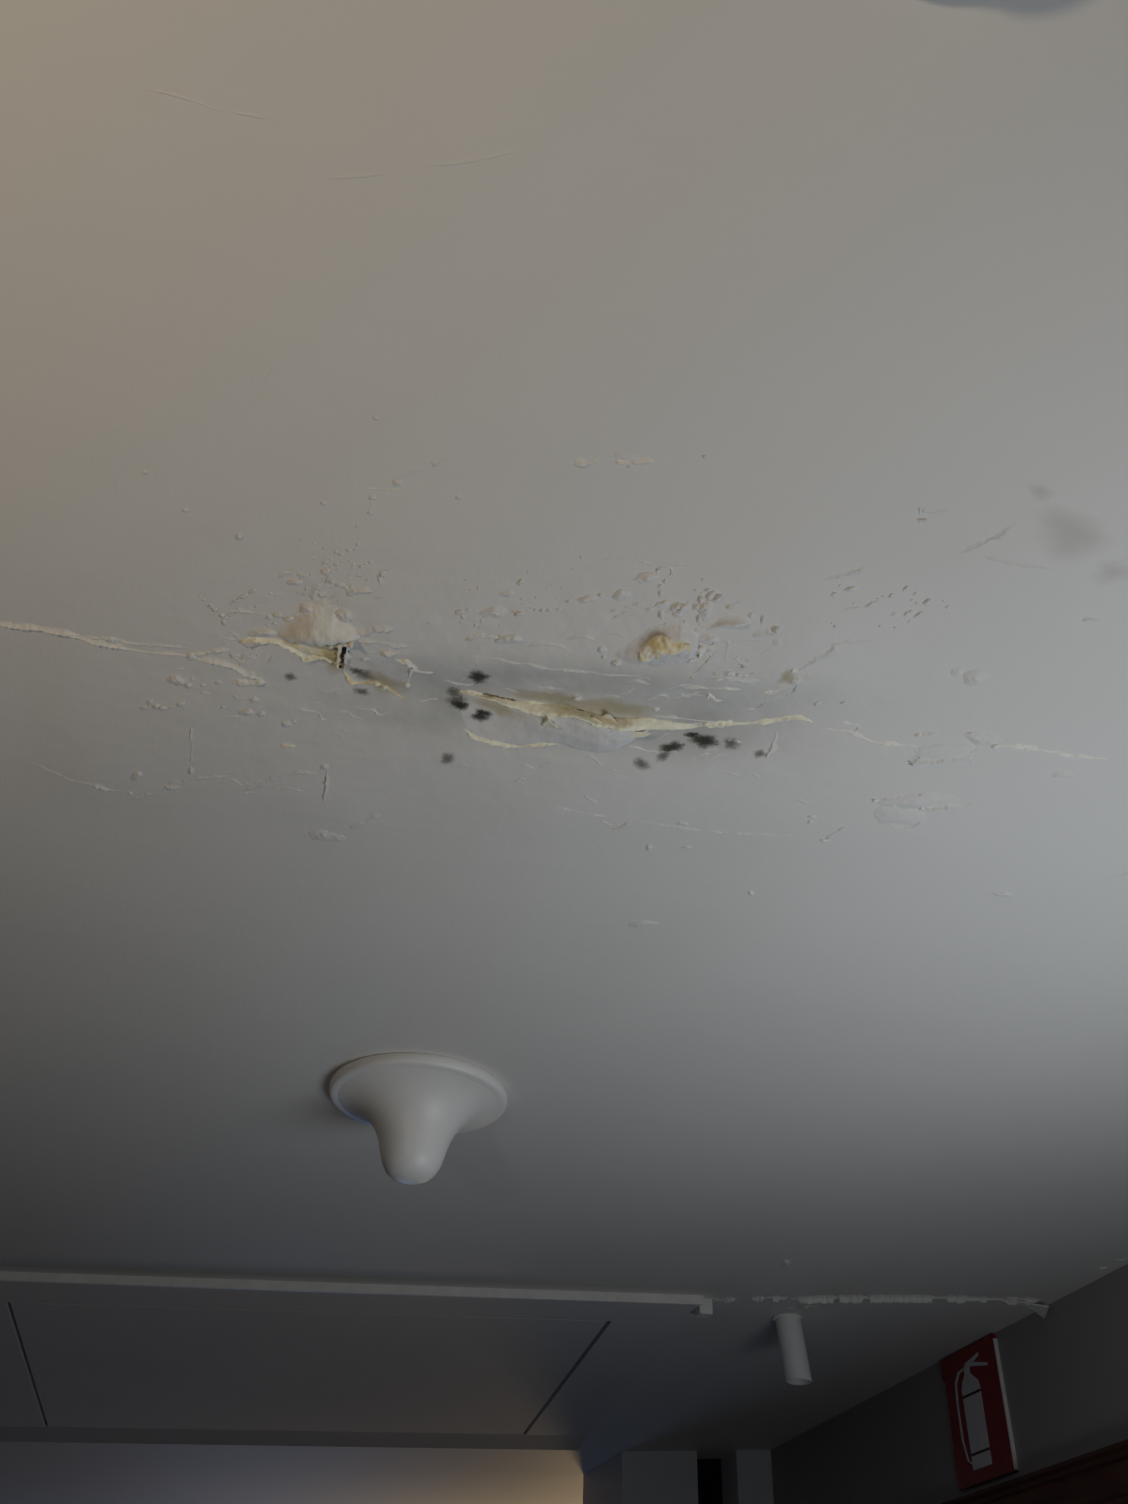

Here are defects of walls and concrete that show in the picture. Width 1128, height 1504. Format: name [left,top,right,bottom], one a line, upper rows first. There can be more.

crack [0,621,282,712]
damp [451,691,490,720]
peeling [239,557,782,783]
damp [661,733,734,758]
crack [697,639,879,728]